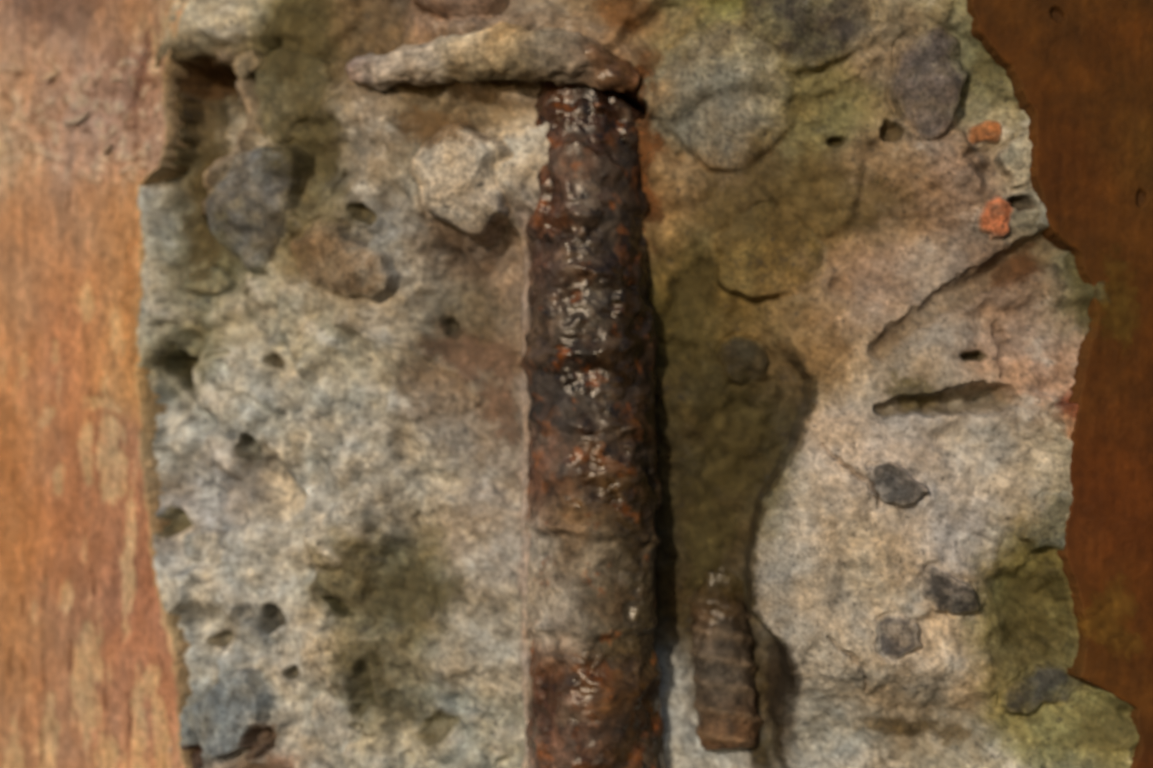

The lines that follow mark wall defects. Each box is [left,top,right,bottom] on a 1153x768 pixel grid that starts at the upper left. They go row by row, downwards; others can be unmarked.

spalling [155,0,291,81]
spalling [411,0,511,22]
spalling [650,19,795,176]
spalling [201,146,316,275]
spalling [410,124,514,247]
rust [621,66,662,229]
spalling [978,195,1014,241]
spalling [993,130,1033,190]
rust [527,258,624,341]
spalling [183,528,230,567]
spalling [310,693,362,755]
rust [531,674,607,762]